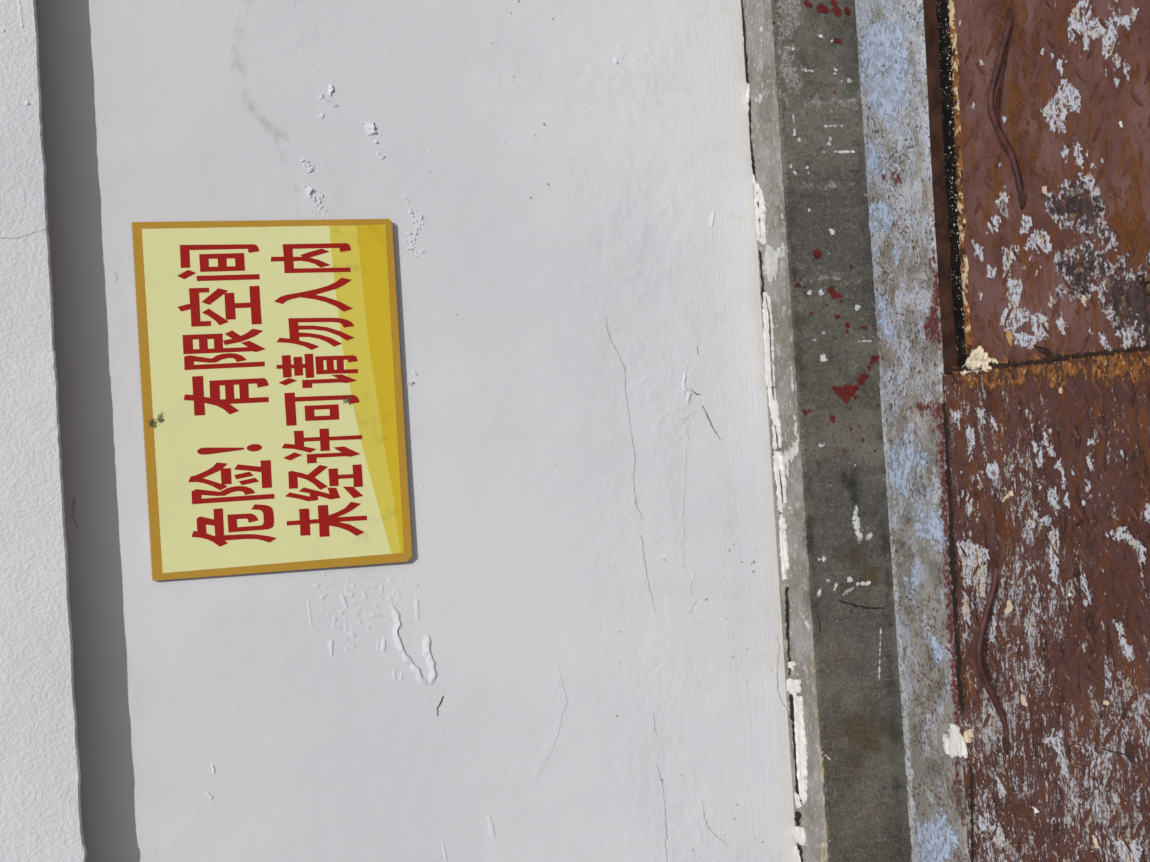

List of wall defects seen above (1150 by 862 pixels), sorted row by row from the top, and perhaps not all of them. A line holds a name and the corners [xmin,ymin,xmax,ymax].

spalling [300,157,330,219]
peeling [752,174,789,581]
peeling [874,294,896,345]
peeling [859,9,914,268]
corrosion [948,0,1150,397]
peeling [786,661,808,809]
peeling [793,826,806,862]
peeling [880,383,959,862]